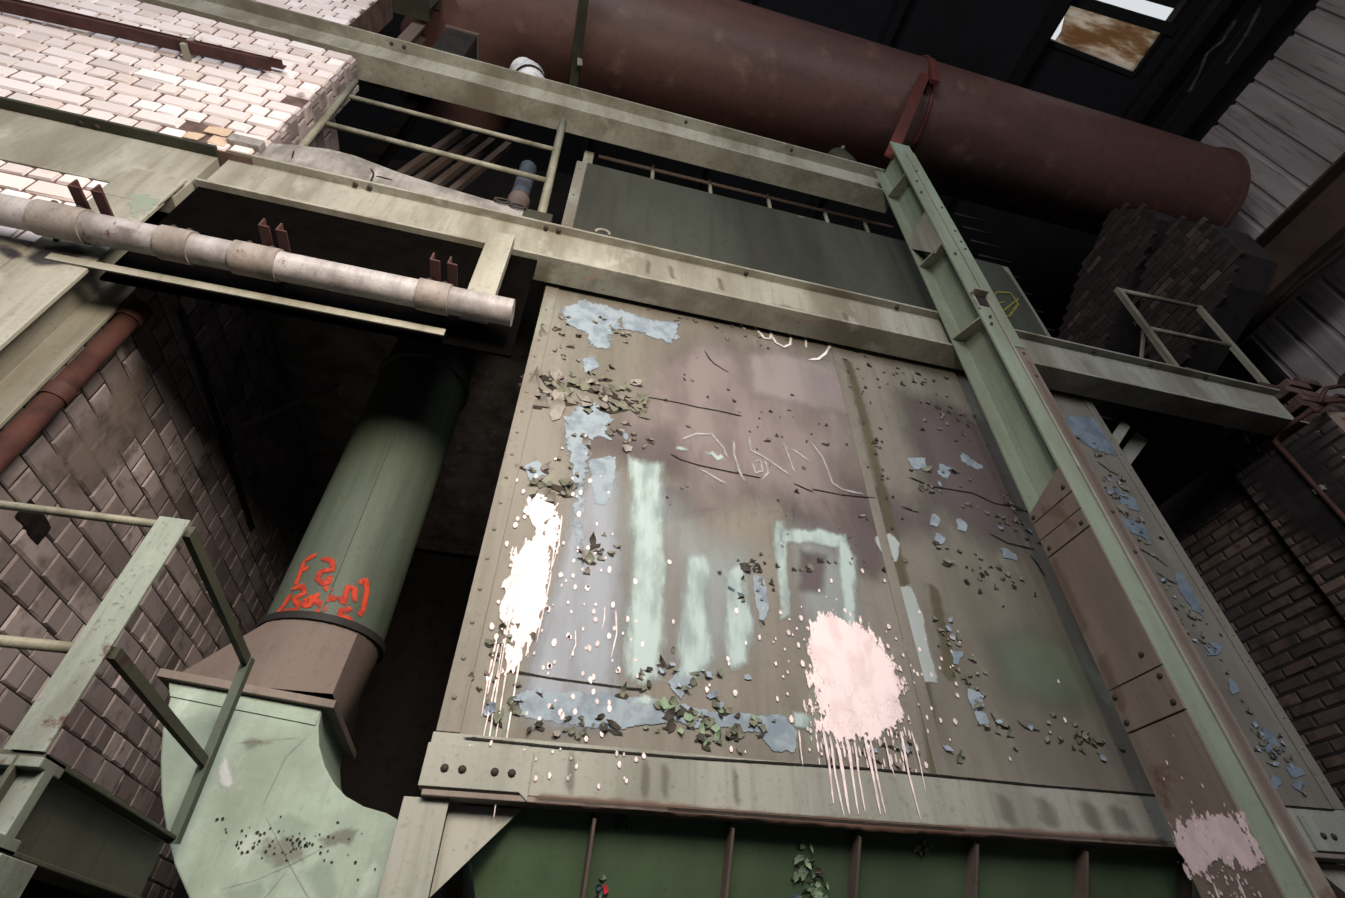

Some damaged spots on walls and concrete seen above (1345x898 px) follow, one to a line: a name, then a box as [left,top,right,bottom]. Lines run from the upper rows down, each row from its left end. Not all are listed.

peeling [513,299,770,575]
peeling [836,348,1041,597]
peeling [1063,415,1116,457]
peeling [1103,473,1174,556]
peeling [468,622,798,753]
peeling [851,725,920,770]
peeling [931,614,1107,763]
peeling [1160,572,1308,795]